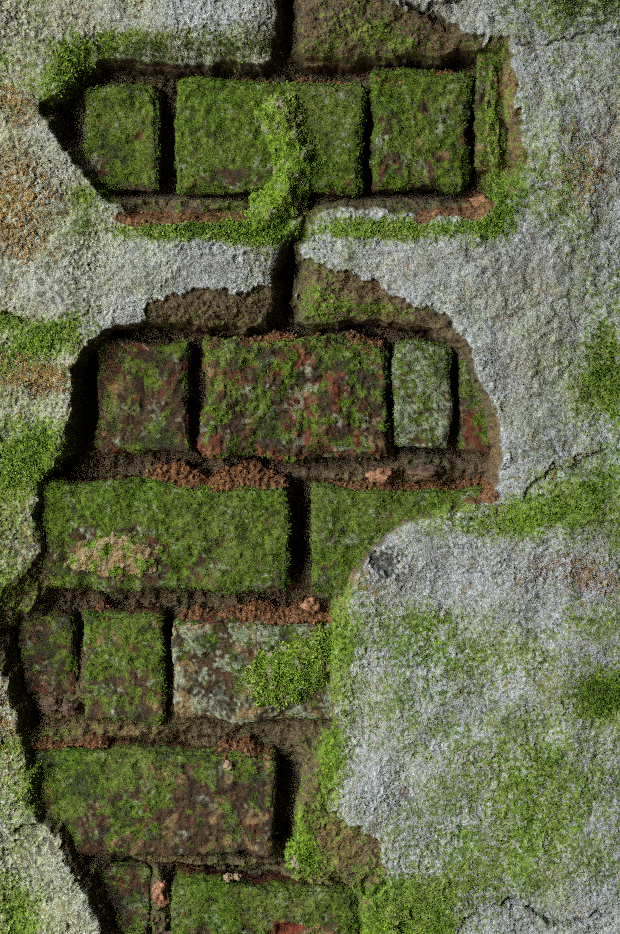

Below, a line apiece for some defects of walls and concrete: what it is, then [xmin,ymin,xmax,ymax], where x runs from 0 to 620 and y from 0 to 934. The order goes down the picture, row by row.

crack [400,0,468,32]
flaking render [39,0,530,227]
crack [524,447,609,500]
flaking render [0,285,276,934]
flaking render [293,258,506,934]
spalling [267,919,305,934]
crack [501,897,615,929]